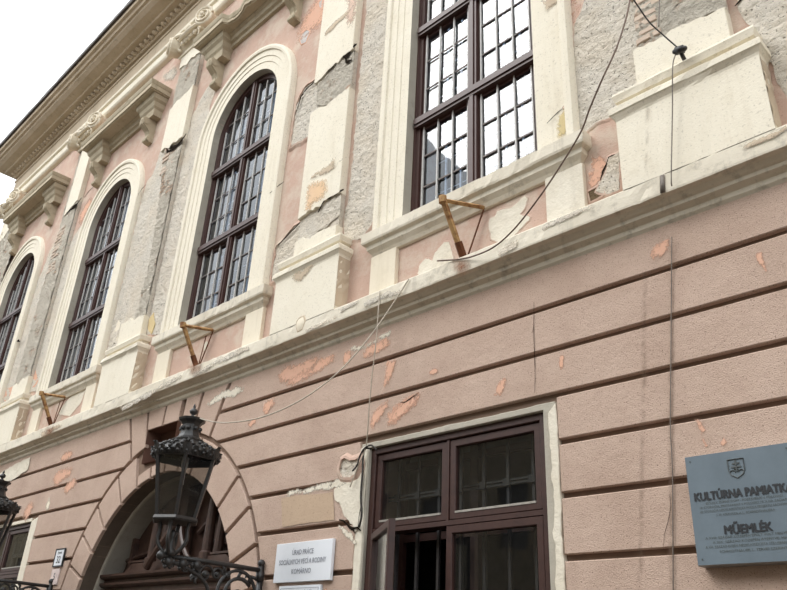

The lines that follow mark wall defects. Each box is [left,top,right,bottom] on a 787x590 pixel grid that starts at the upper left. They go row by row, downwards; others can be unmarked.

flaking render [571,0,727,133]
flaking render [737,0,787,148]
flaking render [289,0,388,243]
flaking render [134,86,216,336]
flaking render [0,231,12,285]
flaking render [269,221,300,287]
peeling [278,331,391,386]
peeling [370,392,420,429]
flaking render [0,457,30,481]
peeling [54,451,77,493]
peeling [281,452,365,544]